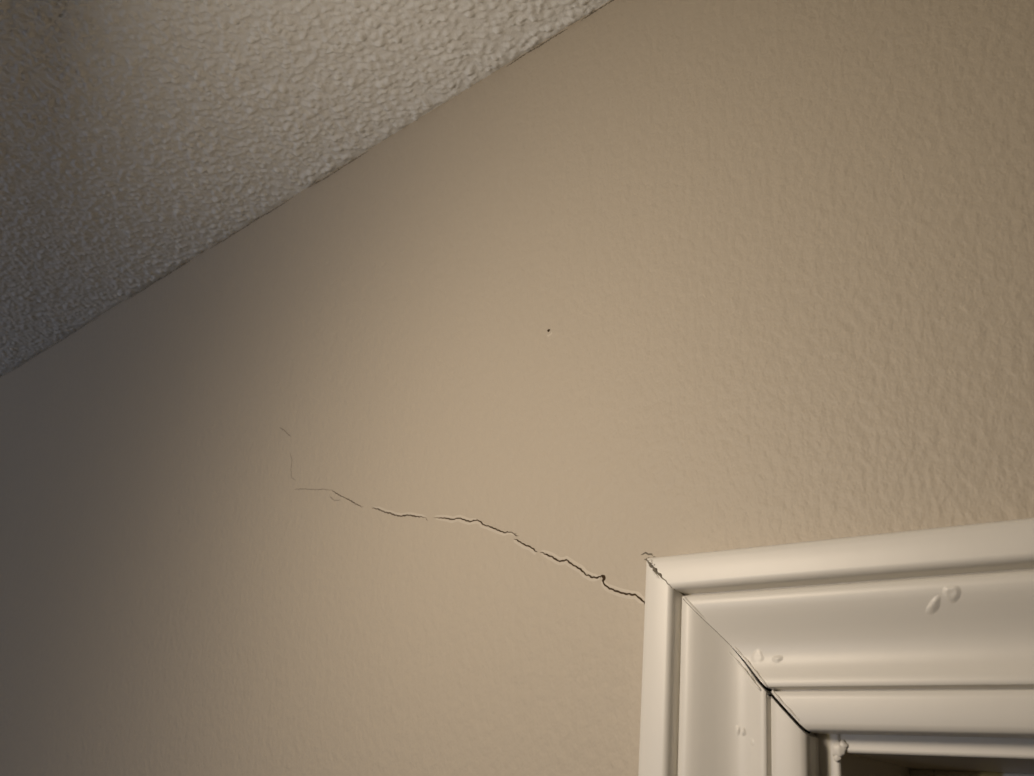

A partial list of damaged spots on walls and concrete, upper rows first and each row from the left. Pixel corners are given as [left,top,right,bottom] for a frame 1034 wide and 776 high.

crack [279,427,811,734]